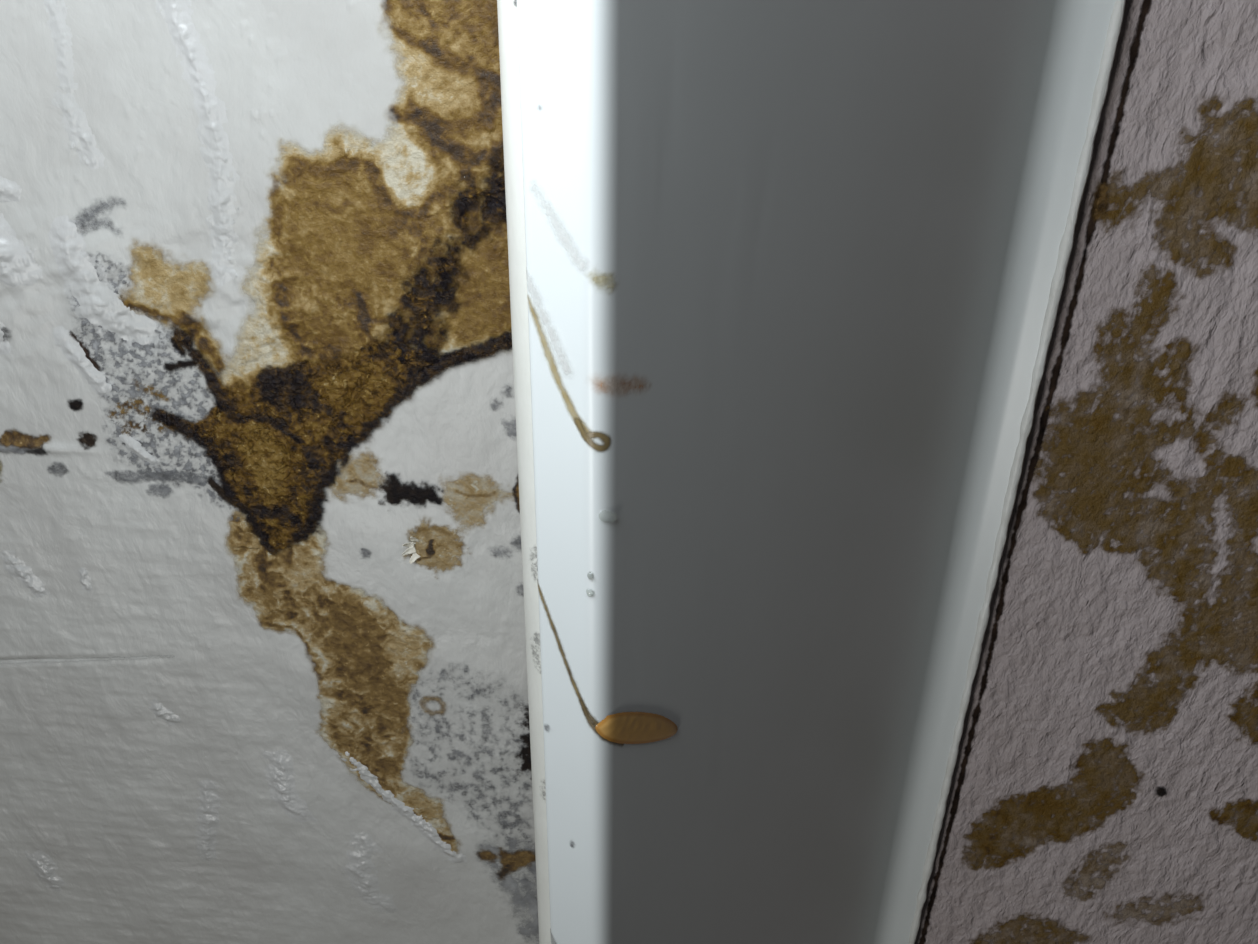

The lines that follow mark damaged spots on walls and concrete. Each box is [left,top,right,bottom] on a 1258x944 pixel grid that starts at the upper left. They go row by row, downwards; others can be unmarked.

leakage [74,0,556,944]
crack [919,0,1152,944]
leakage [962,96,1258,870]
leakage [972,915,1089,944]
leakage [1063,842,1129,901]
leakage [1106,894,1203,926]